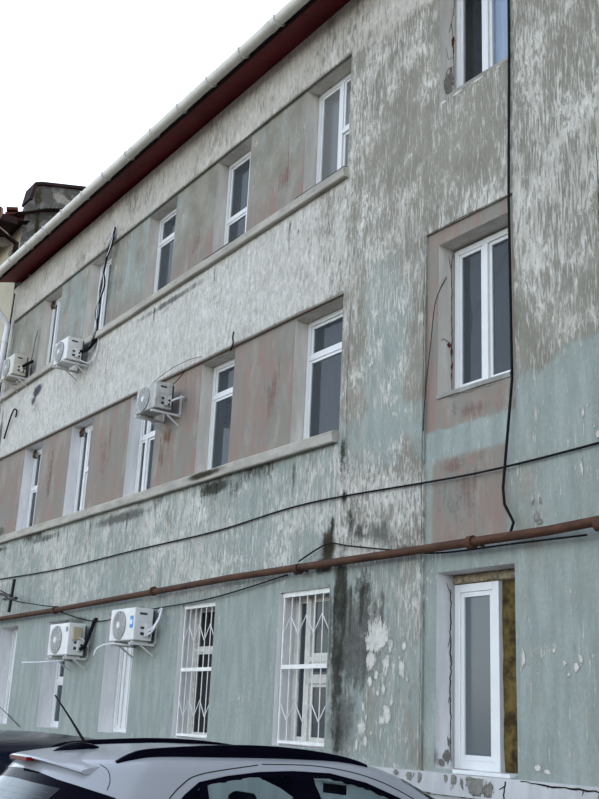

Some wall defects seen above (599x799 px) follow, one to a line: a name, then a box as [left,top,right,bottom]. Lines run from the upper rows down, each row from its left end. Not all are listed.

crack [444,256,453,388]
crack [418,406,426,505]
water stain [347,510,387,541]
water stain [329,565,370,752]
peeling [363,598,408,725]
crack [445,583,453,744]
peeling [354,703,372,751]
flaking render [439,735,494,798]
crack [499,781,599,799]